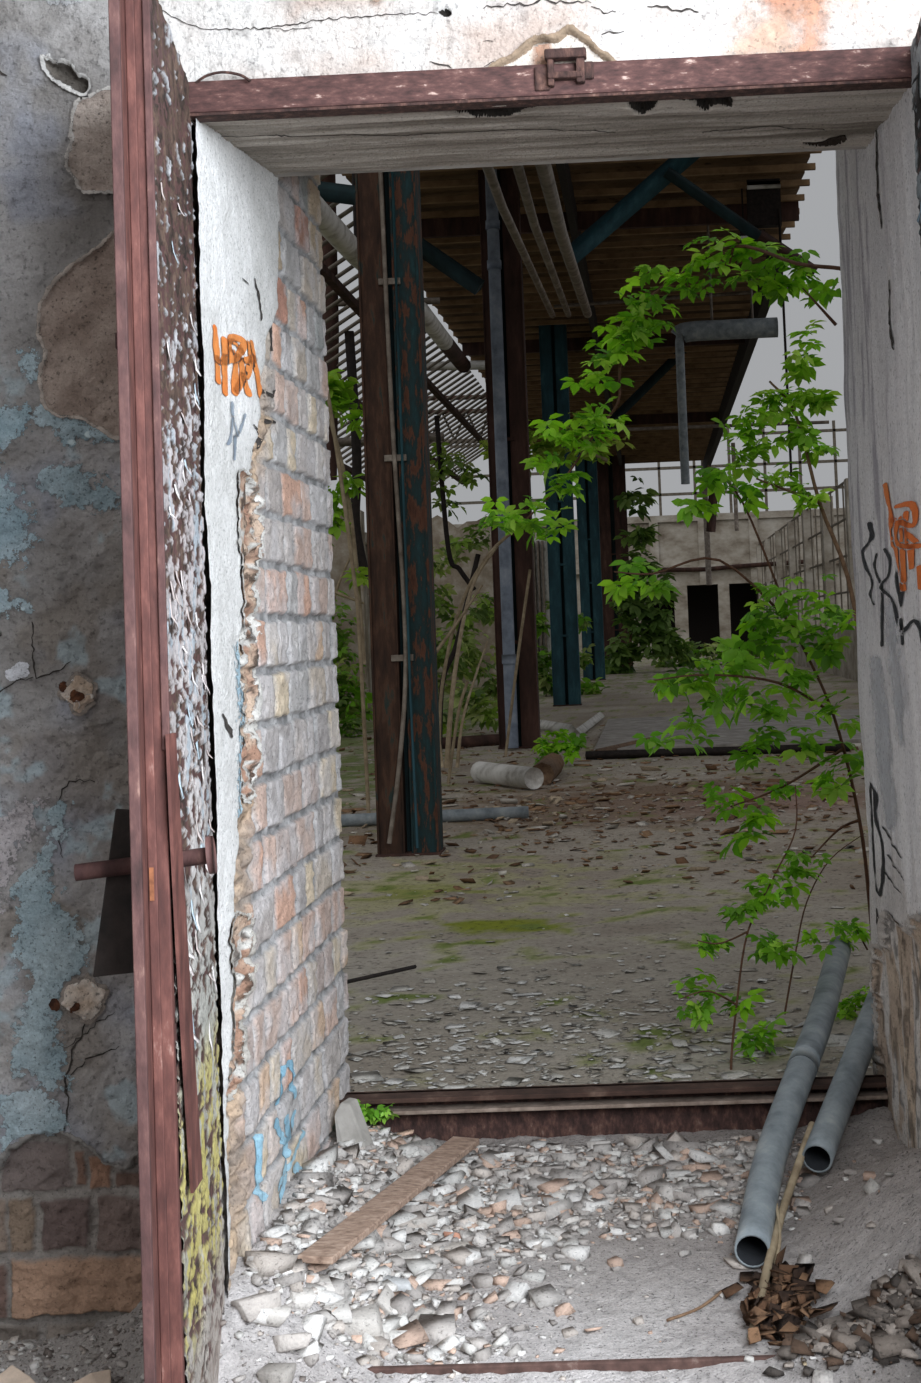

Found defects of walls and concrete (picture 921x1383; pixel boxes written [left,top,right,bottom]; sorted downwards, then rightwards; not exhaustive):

crack [163,10,438,31]
corrosion [735,0,821,55]
spalling [40,53,113,194]
spalling [0,231,121,571]
peeling [0,588,35,636]
peeling [5,662,30,681]
spalling [57,671,98,716]
spalling [233,468,266,818]
spalling [0,795,142,1341]
crack [64,1012,119,1131]